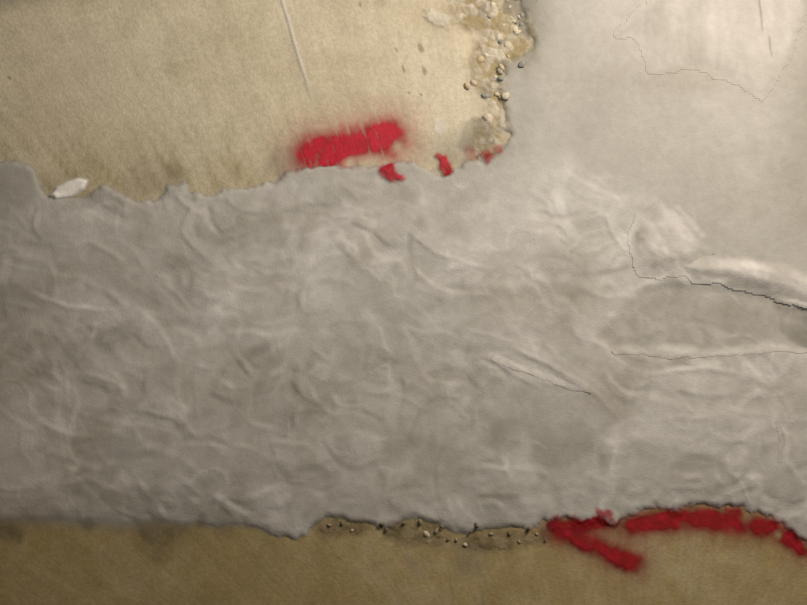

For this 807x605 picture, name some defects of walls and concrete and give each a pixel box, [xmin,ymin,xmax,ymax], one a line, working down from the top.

spalling [427,0,532,154]
spalling [50,178,88,199]
spalling [379,519,547,549]